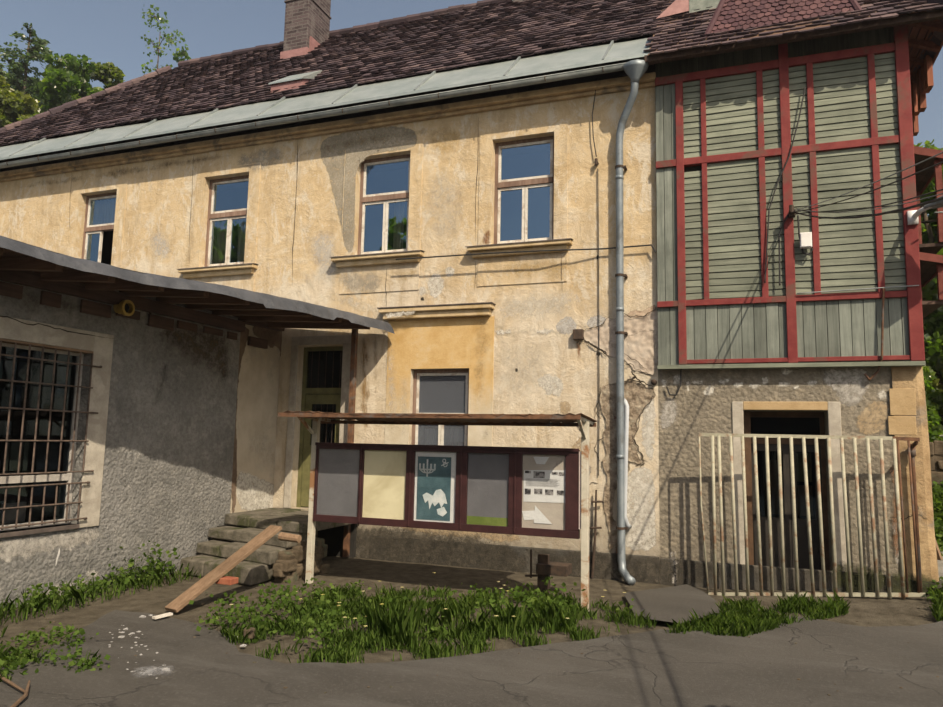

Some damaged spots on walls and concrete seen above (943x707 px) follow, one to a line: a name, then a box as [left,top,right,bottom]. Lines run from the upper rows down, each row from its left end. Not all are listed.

crack [291,145,299,280]
crack [594,345,653,387]
flaking render [537,305,817,551]